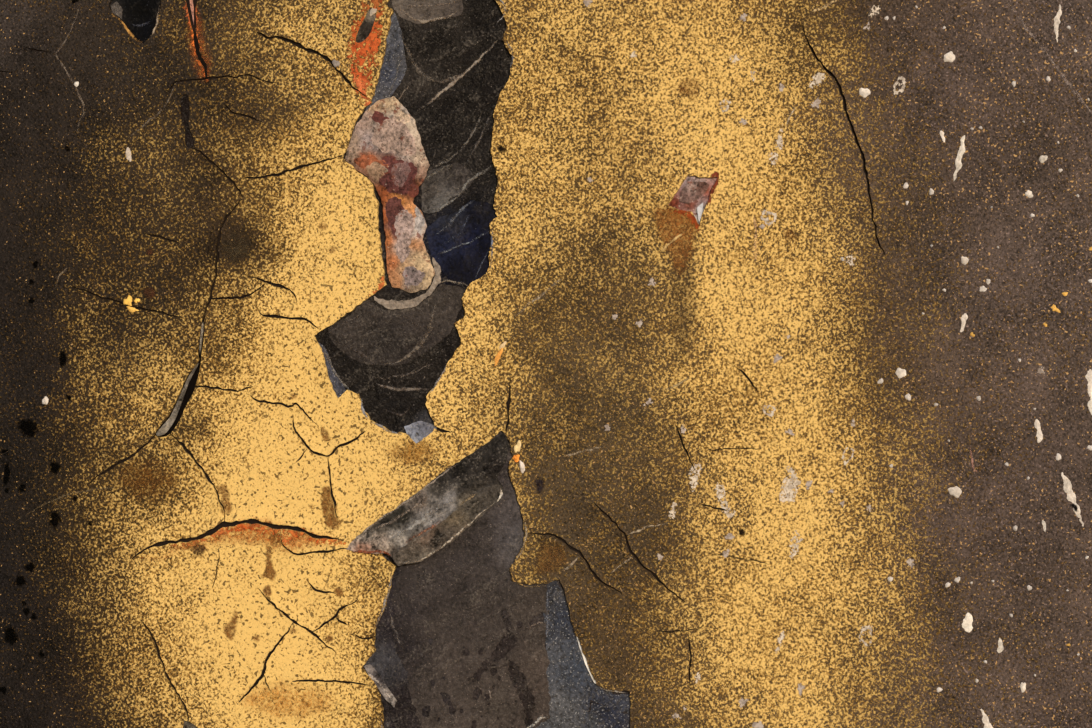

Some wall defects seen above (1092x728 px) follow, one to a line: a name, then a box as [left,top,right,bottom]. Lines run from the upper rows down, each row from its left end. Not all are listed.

peeling [110,0,161,44]
corrosion [183,0,209,80]
crack [169,74,278,90]
crack [257,32,367,97]
corrosion [332,0,441,310]
crack [801,24,885,255]
peeling [315,0,513,443]
crack [73,148,373,702]
corrosion [170,519,346,555]
peeling [347,431,631,728]
crack [528,532,623,594]
crack [141,620,189,720]